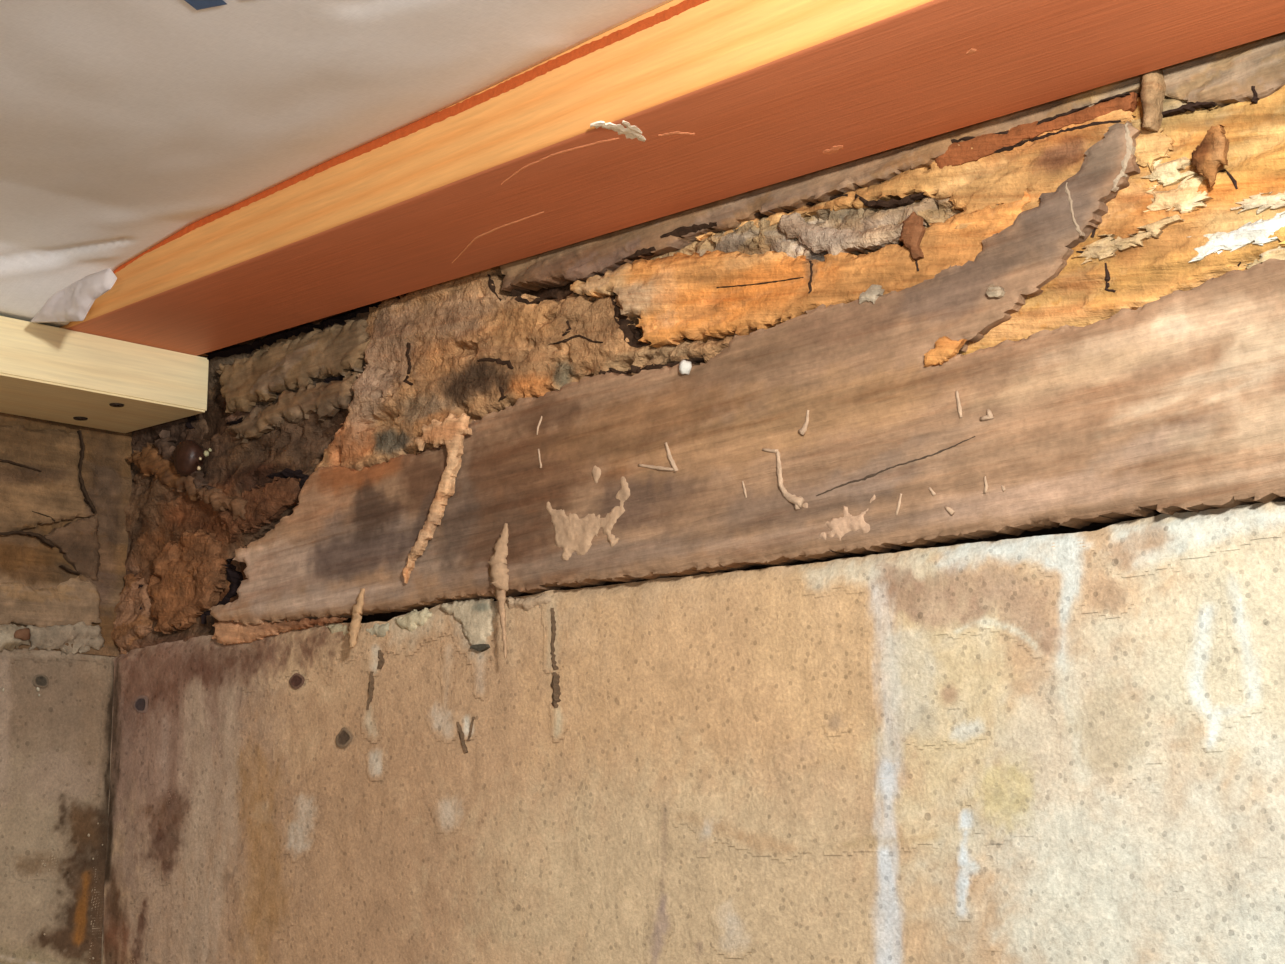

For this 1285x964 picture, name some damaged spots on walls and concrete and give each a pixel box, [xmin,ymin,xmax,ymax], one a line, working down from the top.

peeling [1111,118,1175,192]
peeling [1191,125,1230,187]
spalling [650,196,962,262]
spalling [1064,182,1085,238]
peeling [859,284,884,304]
peeling [924,336,967,367]
spalling [325,623,349,636]
spalling [366,593,552,667]
damp [644,502,1285,964]